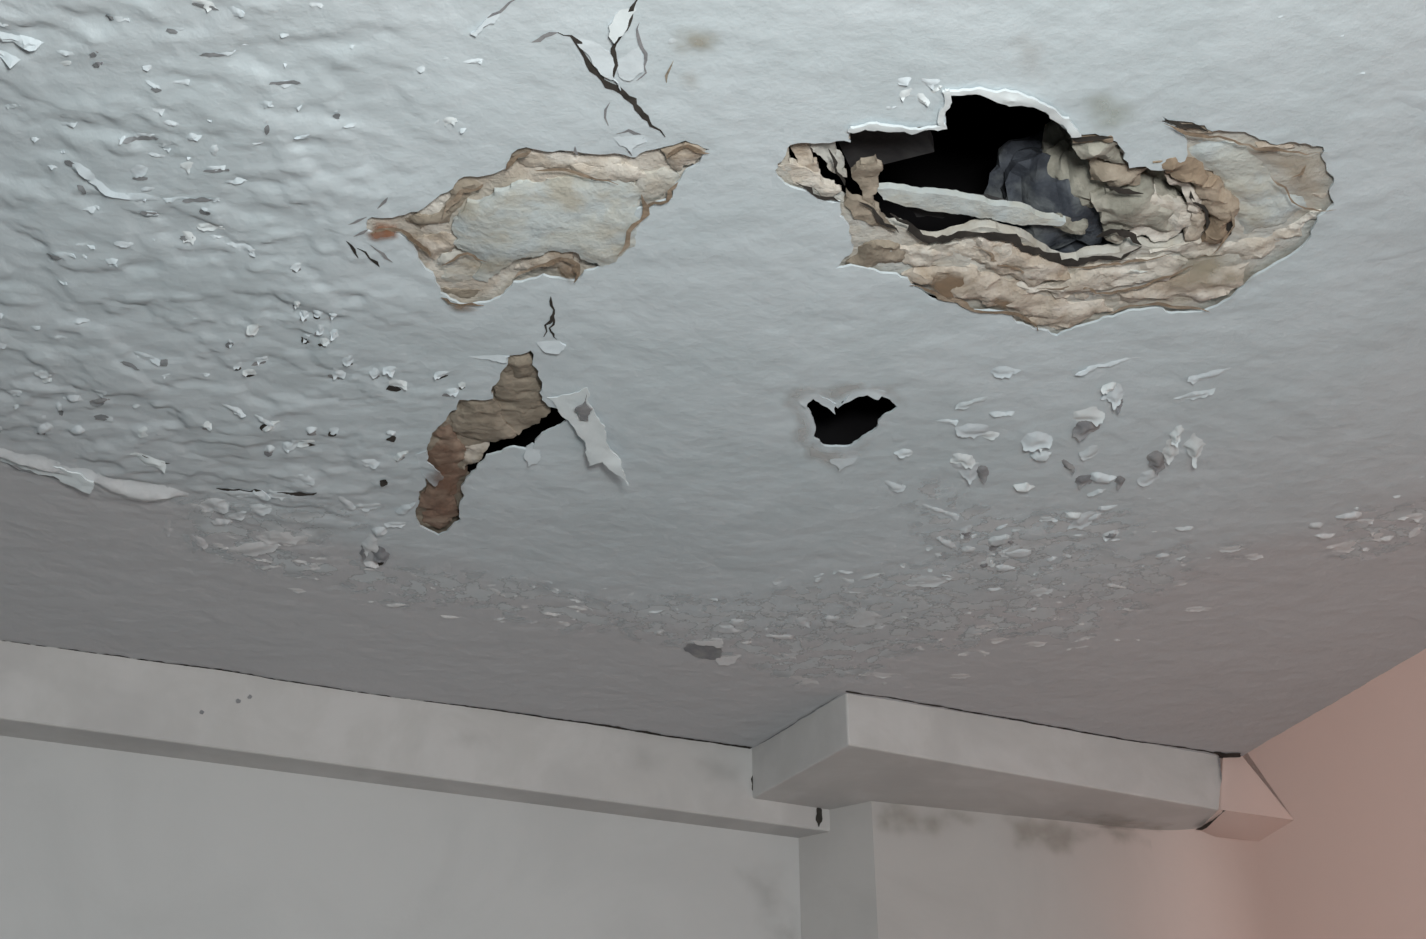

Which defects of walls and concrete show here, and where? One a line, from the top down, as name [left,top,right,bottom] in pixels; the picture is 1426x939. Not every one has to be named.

crack [533,0,665,156]
spalling [789,77,1052,232]
flaking render [366,141,710,306]
peeling [225,324,270,377]
peeling [293,301,338,347]
peeling [34,390,113,435]
peeling [130,426,170,473]
flaking render [189,351,629,569]
spalling [807,395,896,445]
peeling [884,357,1206,597]
peeling [1308,495,1426,557]
peeling [684,639,742,666]